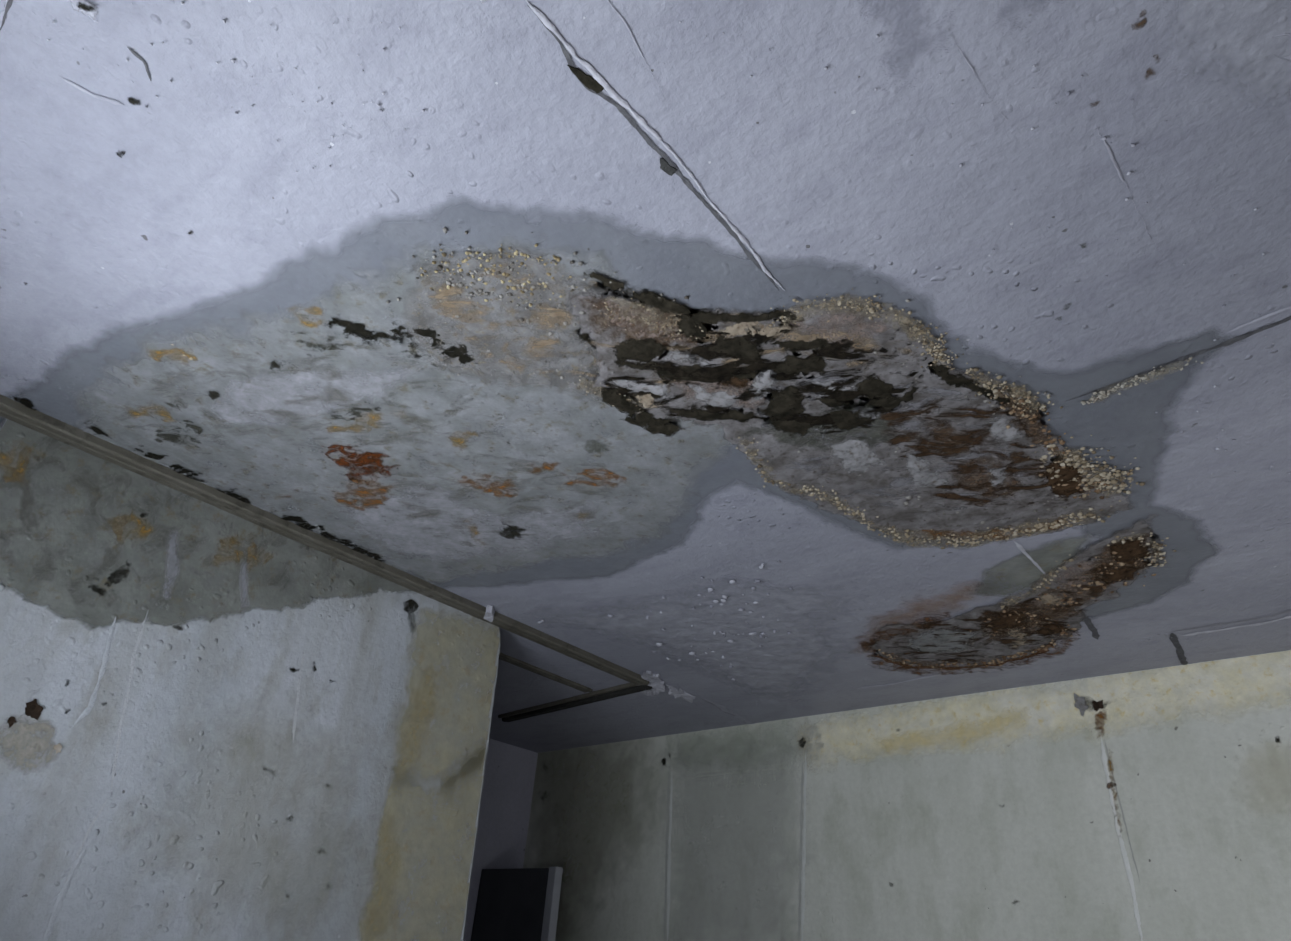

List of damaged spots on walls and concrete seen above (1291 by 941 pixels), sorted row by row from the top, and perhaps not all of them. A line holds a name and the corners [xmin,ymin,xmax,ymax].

crack [0,0,13,30]
crack [526,1,785,291]
corrosion [322,415,399,510]
water stain [0,202,1225,629]
spalling [386,227,1176,676]
spalling [0,699,62,769]
water stain [360,612,499,941]
water stain [678,650,1291,762]
crack [1101,734,1143,941]